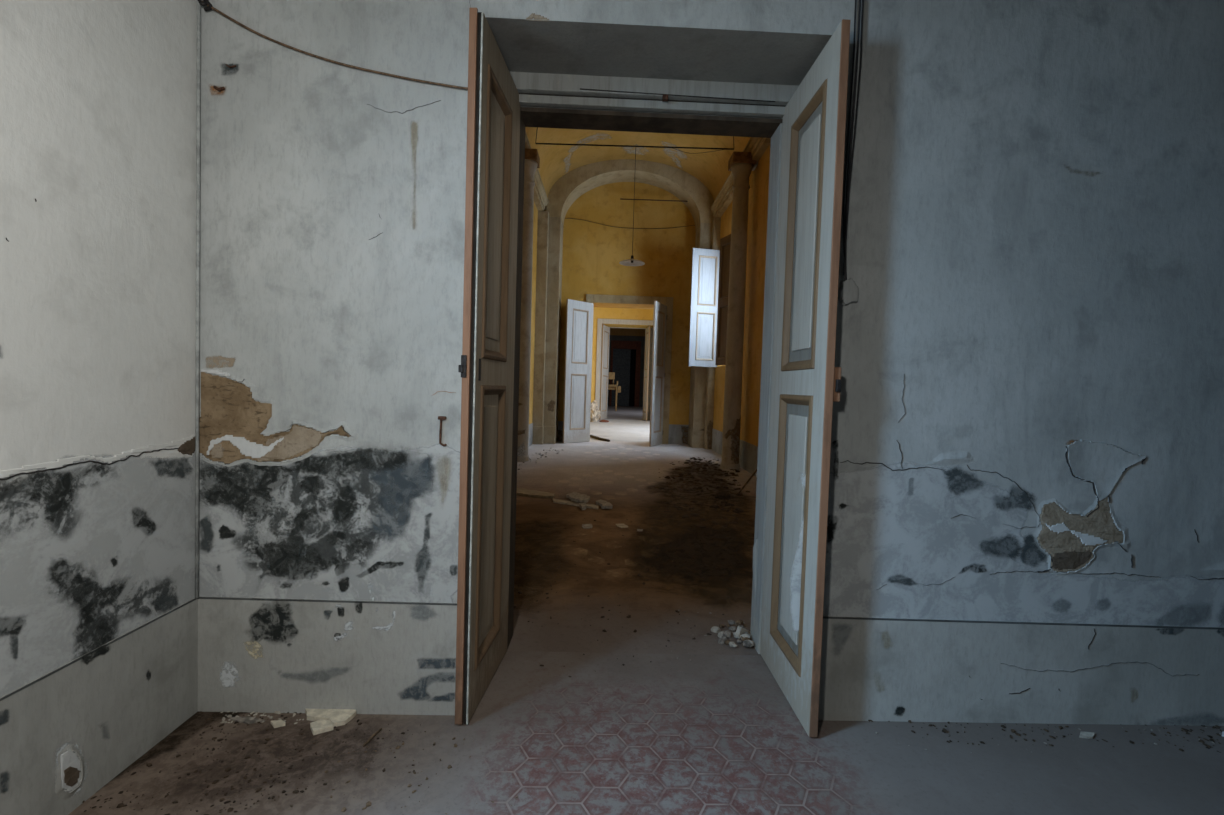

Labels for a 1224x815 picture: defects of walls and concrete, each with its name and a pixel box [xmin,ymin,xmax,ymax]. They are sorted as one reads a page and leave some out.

flaking render [0,356,358,480]
leakage [0,444,460,725]
leakage [791,519,804,631]
crack [840,380,1041,529]
leakage [823,440,1224,651]
crack [990,544,1161,578]
flaking render [1032,446,1132,576]
crack [969,629,1200,700]
leakage [0,772,9,793]